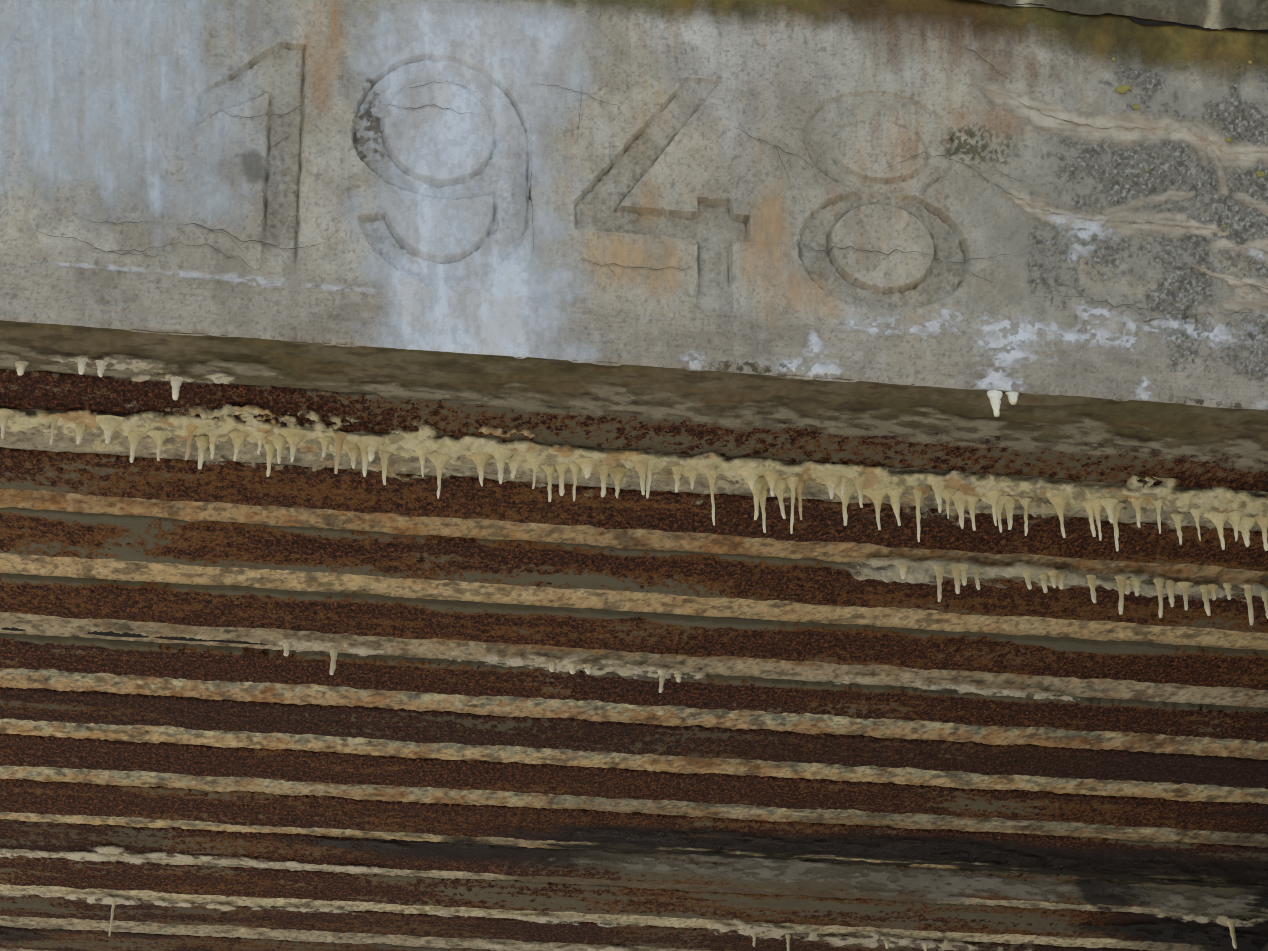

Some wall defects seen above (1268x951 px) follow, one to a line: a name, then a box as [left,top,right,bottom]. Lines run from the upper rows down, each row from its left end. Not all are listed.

crack [881,152,1268,321]
efflorescence [0,347,283,400]
efflorescence [355,306,1268,468]
efflorescence [0,405,1268,551]
efflorescence [853,559,1268,625]